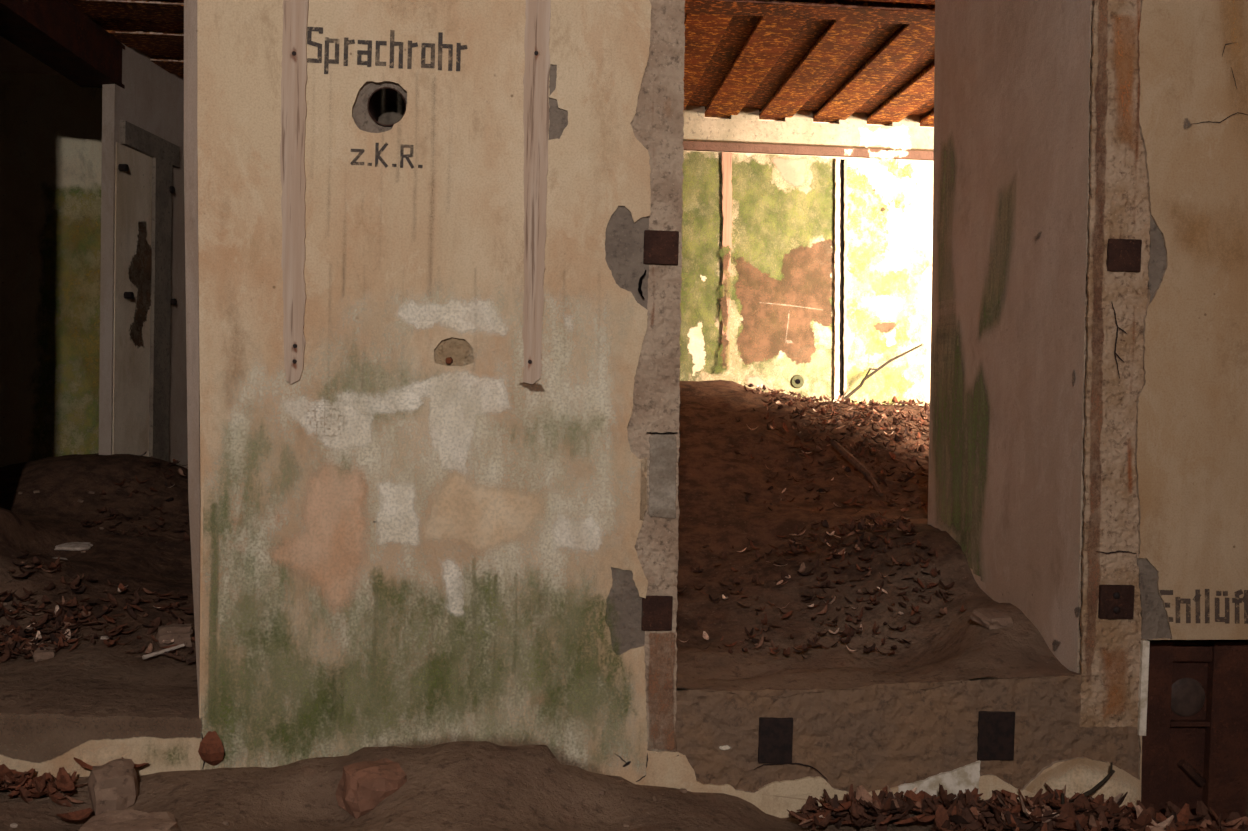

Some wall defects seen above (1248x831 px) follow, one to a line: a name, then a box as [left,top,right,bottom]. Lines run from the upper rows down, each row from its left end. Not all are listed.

spalling [353,83,407,133]
spalling [549,65,568,140]
spalling [434,337,474,367]
spalling [519,382,544,392]
spalling [605,0,1171,808]
peeling [424,472,544,550]